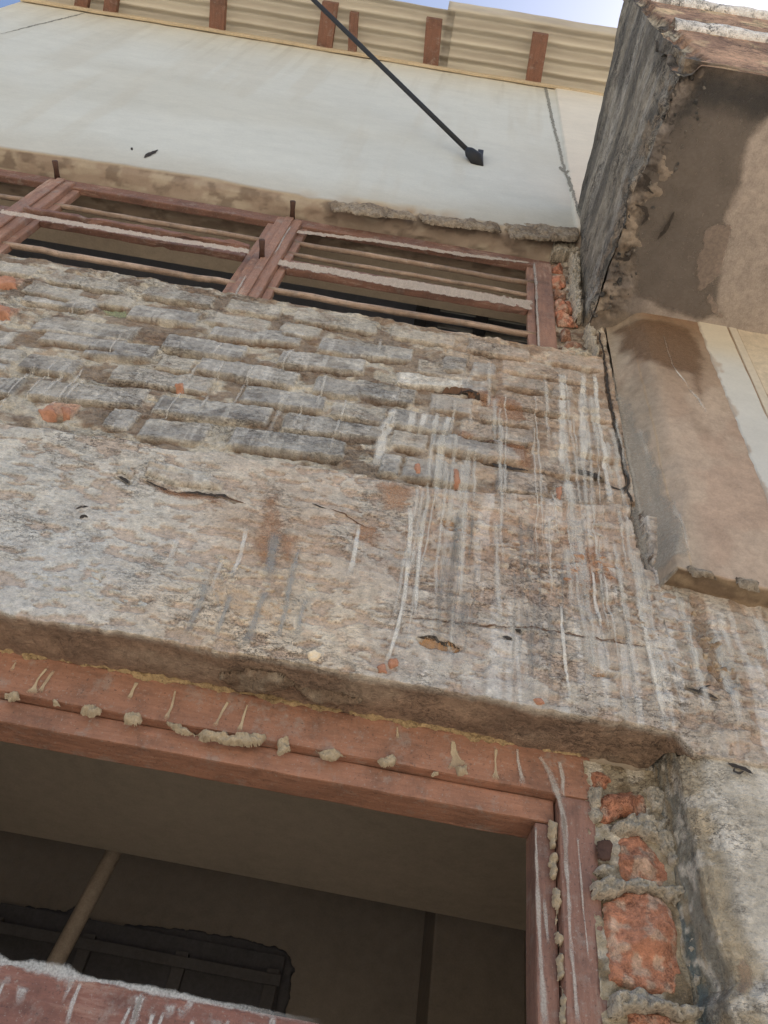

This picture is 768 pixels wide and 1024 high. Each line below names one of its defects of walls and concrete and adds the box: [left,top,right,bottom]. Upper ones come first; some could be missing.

spalling [661,71,706,123]
spalling [593,214,637,318]
flaking render [697,225,731,318]
water stain [617,320,700,378]
water stain [375,410,395,461]
crack [577,331,634,517]
crack [117,476,246,504]
water stain [388,413,476,656]
water stain [533,375,687,708]
spalling [419,635,460,653]